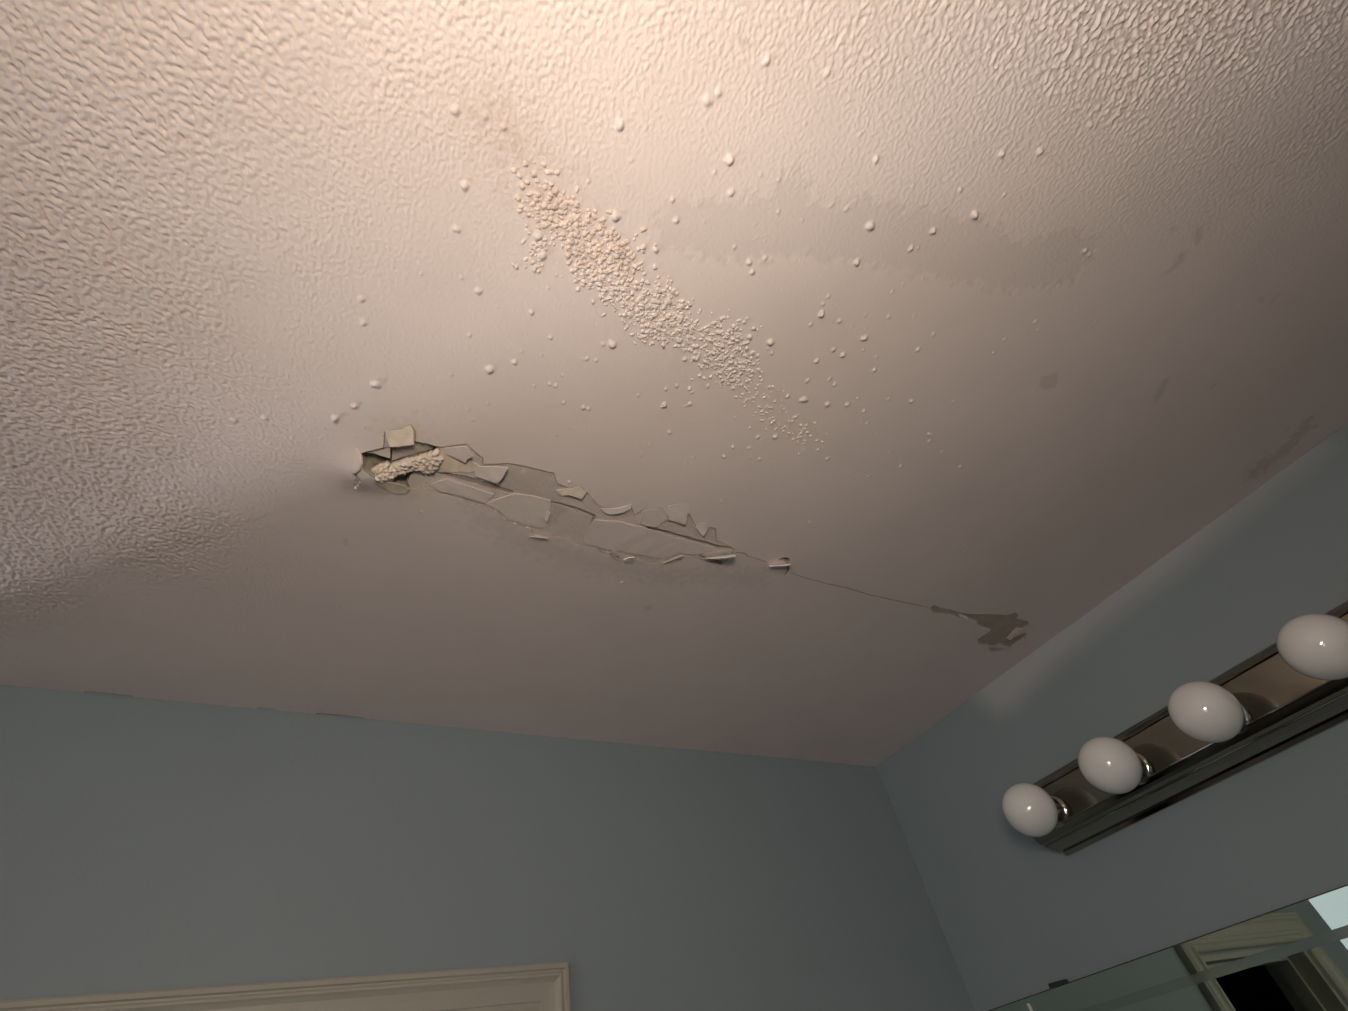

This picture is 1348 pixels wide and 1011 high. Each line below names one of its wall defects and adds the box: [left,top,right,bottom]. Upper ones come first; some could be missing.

peeling [352,424,766,565]
crack [770,557,929,608]
peeling [931,605,1029,651]